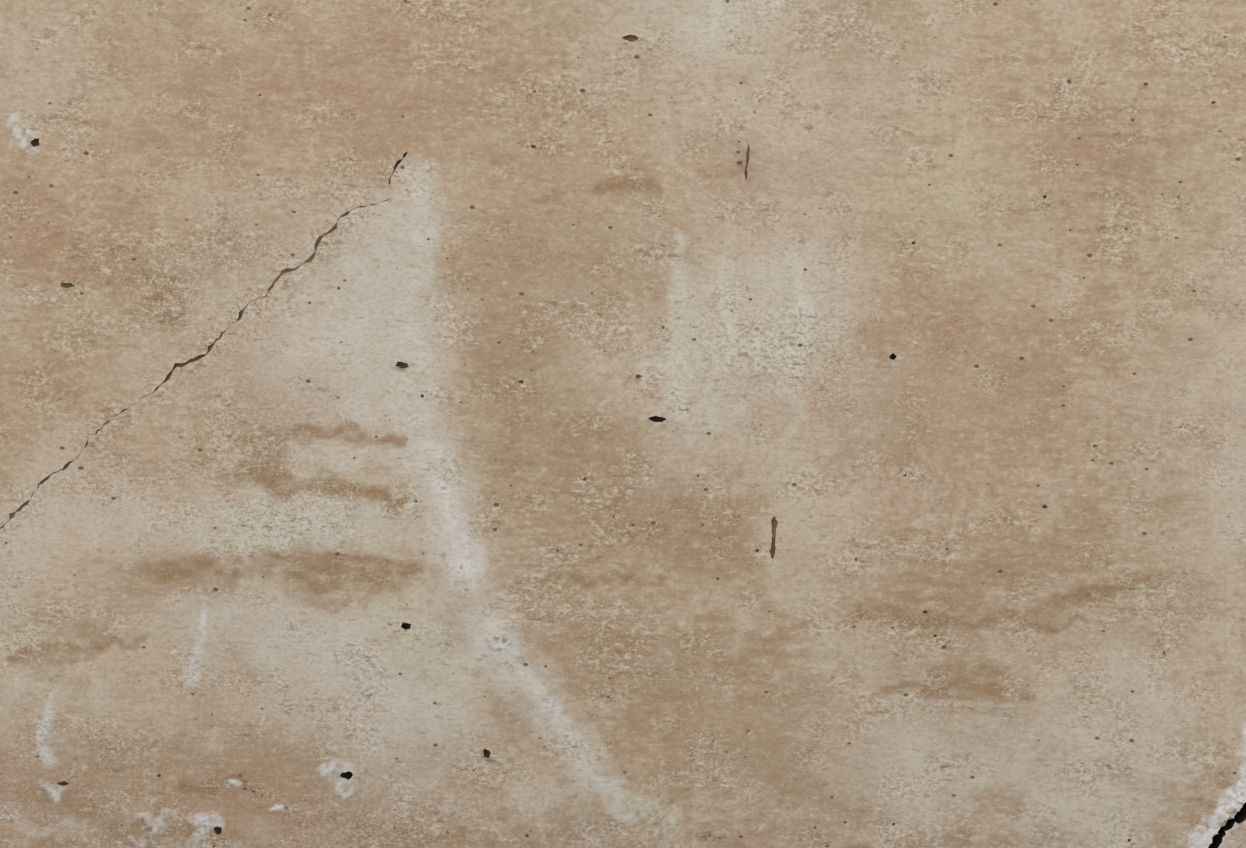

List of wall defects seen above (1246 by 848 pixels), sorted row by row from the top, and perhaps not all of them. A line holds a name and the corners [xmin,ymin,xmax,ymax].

crack [0,143,416,540]
crack [1184,703,1246,848]